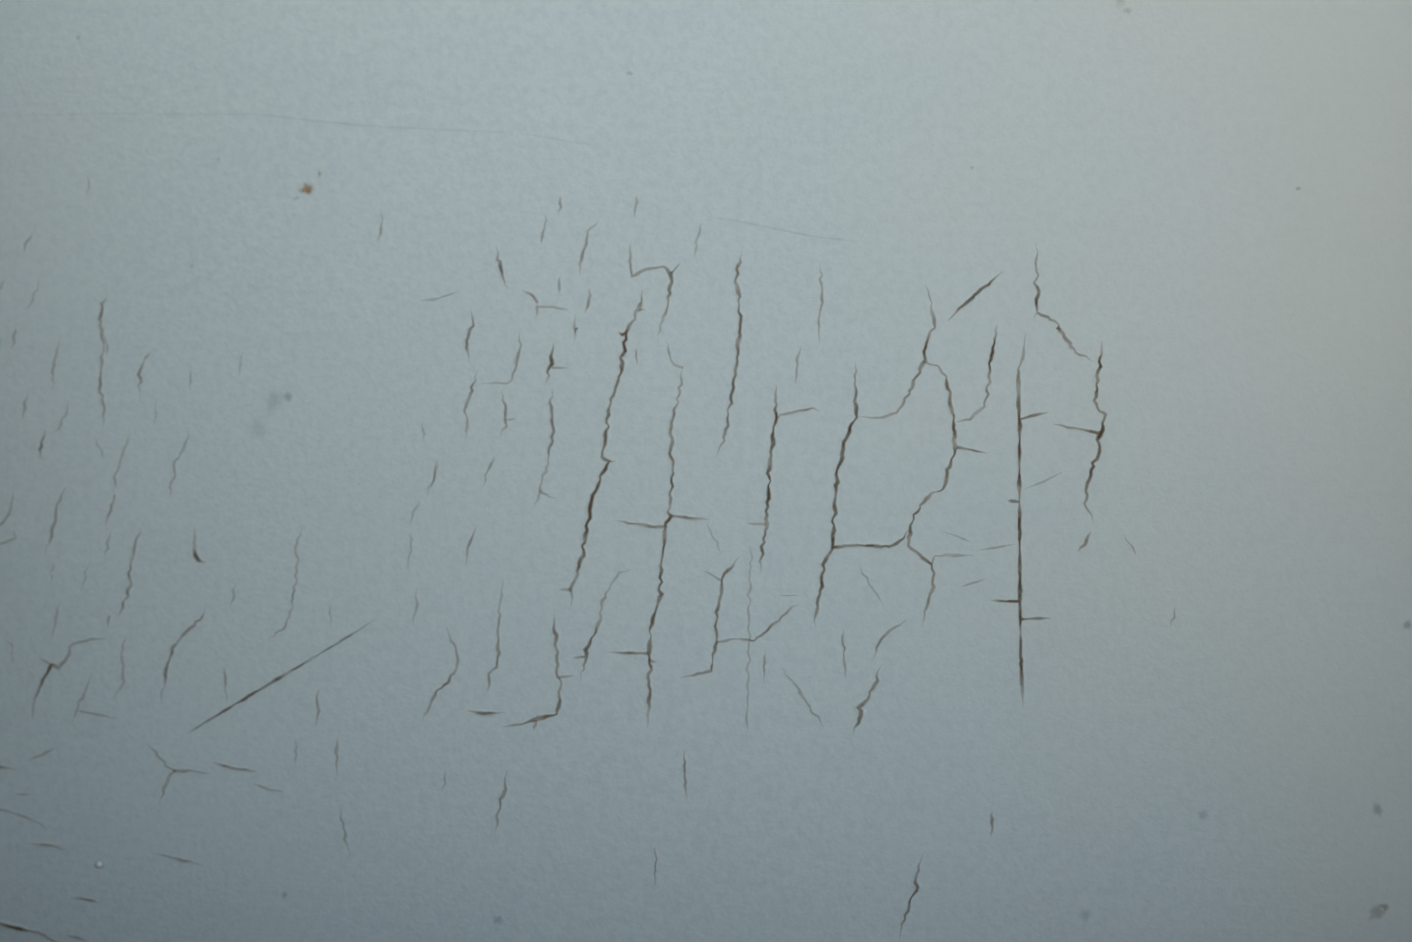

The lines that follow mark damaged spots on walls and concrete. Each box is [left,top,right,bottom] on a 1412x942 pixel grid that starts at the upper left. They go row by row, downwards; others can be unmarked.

crack [578,230,590,262]
crack [494,258,535,299]
crack [95,303,141,412]
crack [463,265,696,724]
crack [711,261,1105,726]
crack [120,545,138,608]
crack [161,616,203,680]
crack [32,663,56,703]
crack [427,675,452,708]
crack [0,919,56,942]